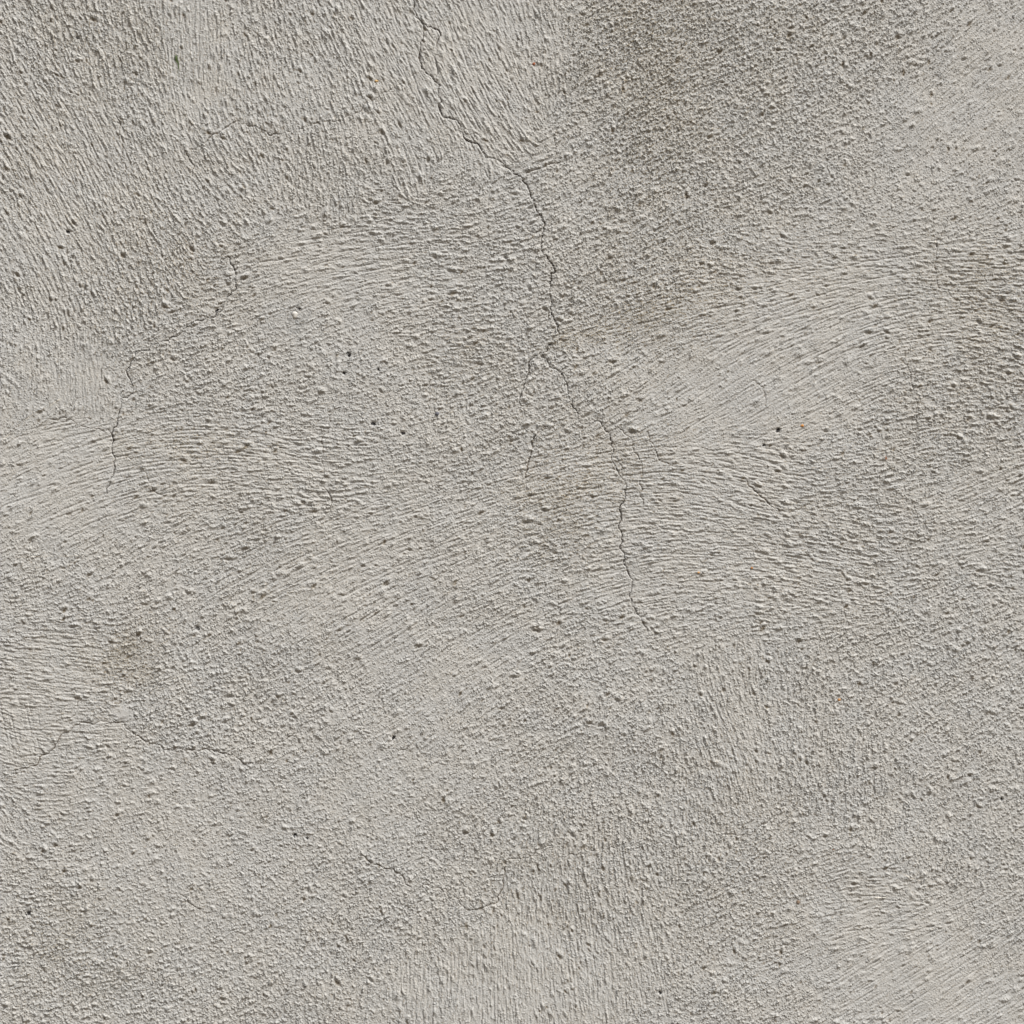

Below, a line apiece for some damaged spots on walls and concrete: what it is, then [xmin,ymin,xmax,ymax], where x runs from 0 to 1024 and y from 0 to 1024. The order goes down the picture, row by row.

crack [39,253,237,496]
crack [186,3,674,631]